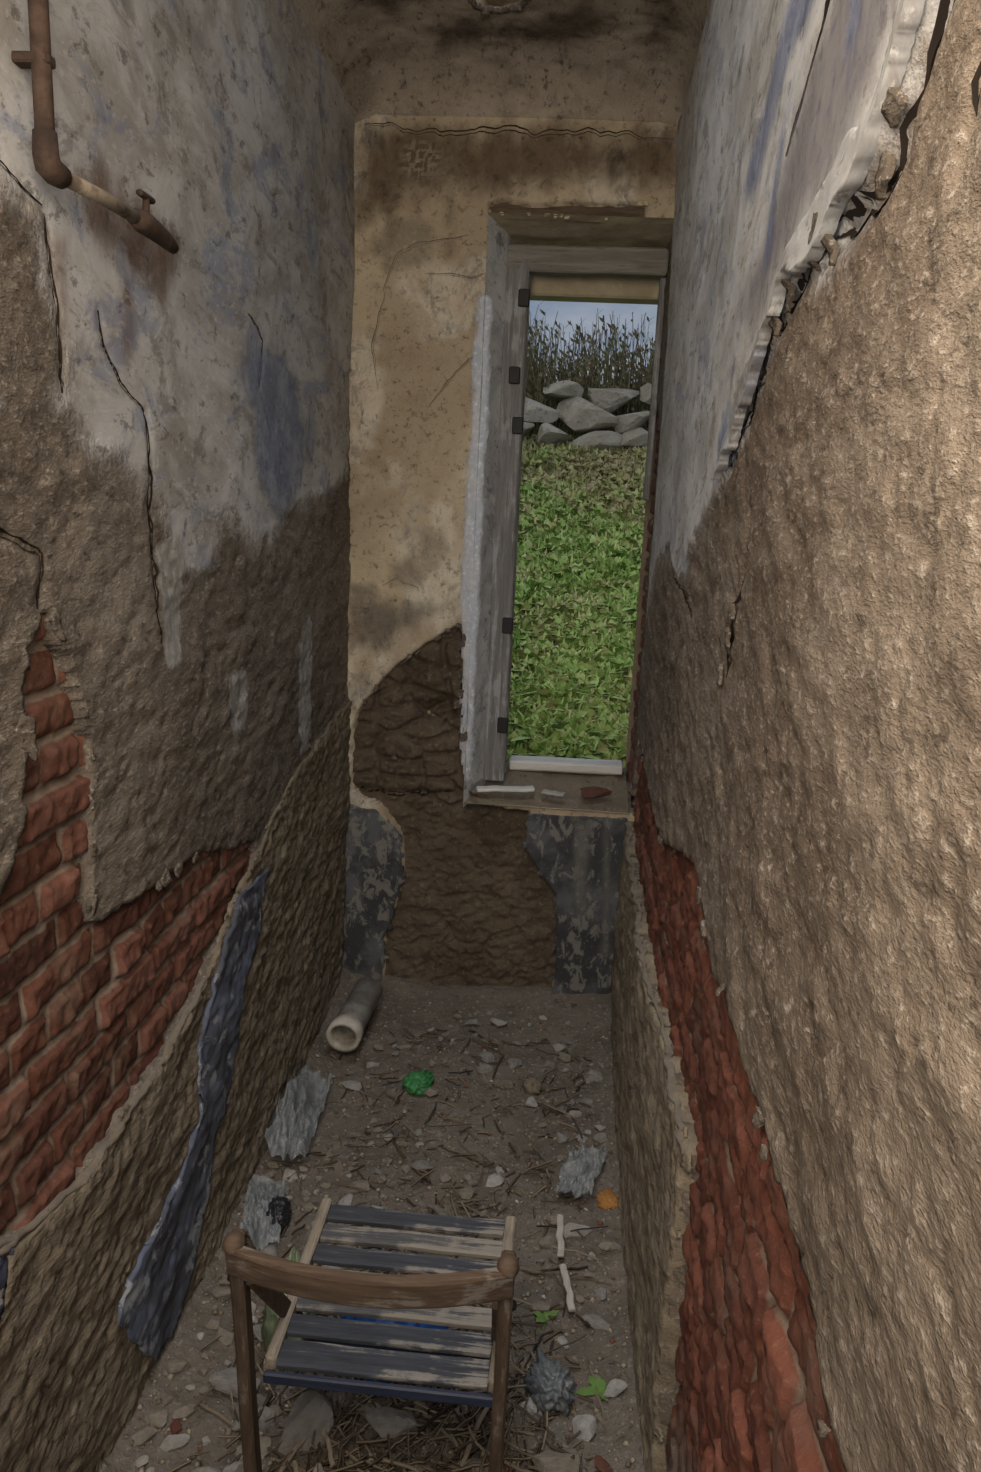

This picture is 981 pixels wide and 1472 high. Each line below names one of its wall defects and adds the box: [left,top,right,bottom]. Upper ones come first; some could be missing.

spalling [468,0,531,18]
crack [969,61,981,144]
crack [0,160,63,393]
peeling [713,0,925,480]
crack [729,0,955,469]
crack [0,527,44,609]
crack [97,310,163,644]
crack [673,577,692,617]
crack [716,518,752,686]
spalling [0,295,845,1472]